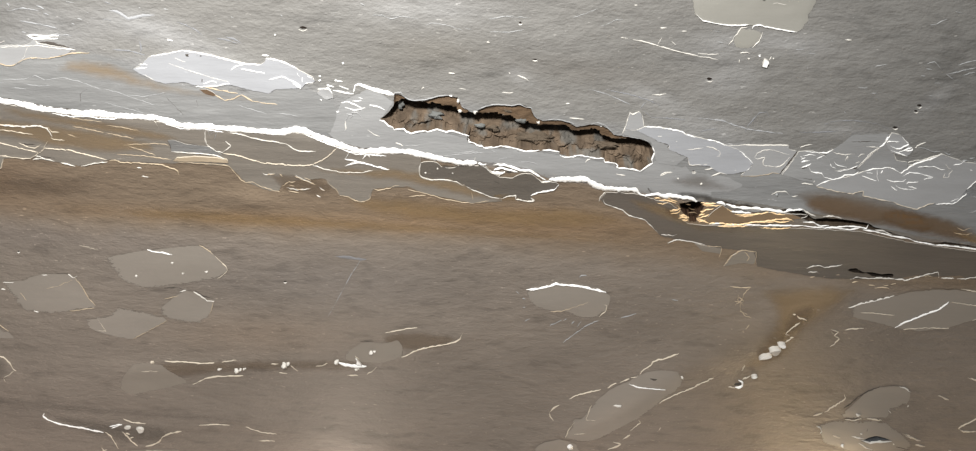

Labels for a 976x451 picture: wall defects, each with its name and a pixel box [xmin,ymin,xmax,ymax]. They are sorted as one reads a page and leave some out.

leakage [68,118,169,160]
crack [0,98,697,202]
peeling [0,34,976,289]
crack [722,201,976,250]
crack [42,414,224,451]